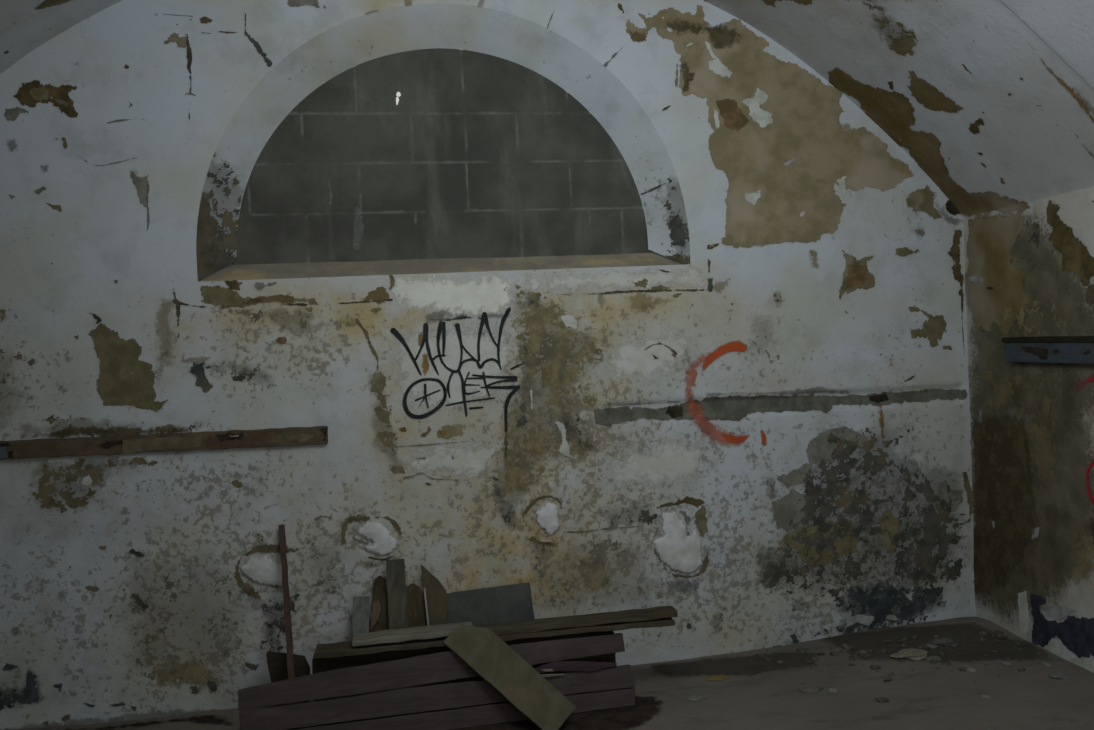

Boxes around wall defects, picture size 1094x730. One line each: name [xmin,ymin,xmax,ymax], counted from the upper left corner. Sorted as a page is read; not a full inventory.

peeling [35,0,74,10]
peeling [4,80,78,121]
peeling [35,186,62,221]
peeling [618,3,1094,334]
peeling [88,312,168,412]
peeling [909,305,952,350]
water stain [426,284,603,526]
water stain [757,216,1094,662]
water stain [533,506,658,613]
water stain [653,635,816,676]
peeling [1017,591,1094,673]